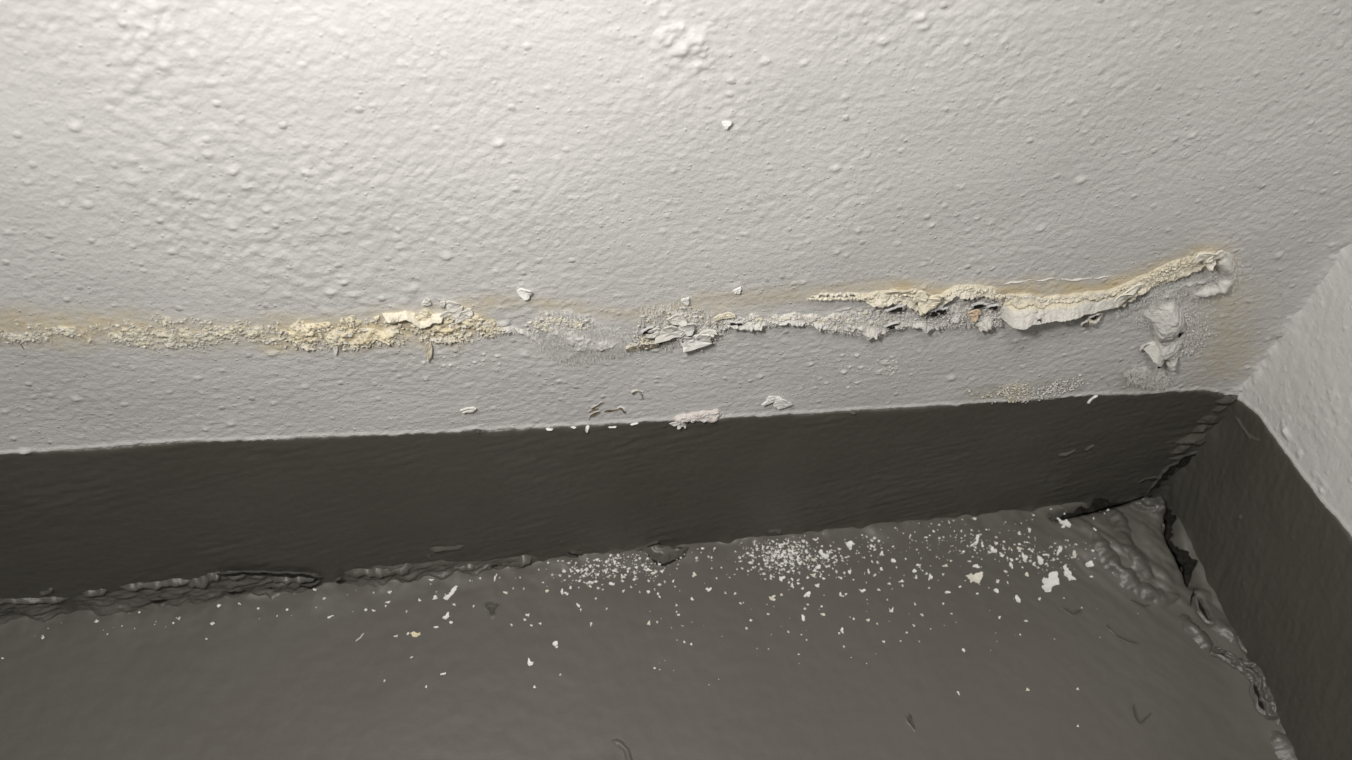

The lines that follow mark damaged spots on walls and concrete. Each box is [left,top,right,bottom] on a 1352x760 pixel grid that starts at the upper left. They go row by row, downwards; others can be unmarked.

peeling [276,298,505,362]
peeling [517,288,532,300]
damp [0,235,1285,406]
spalling [625,297,728,354]
peeling [806,249,1254,330]